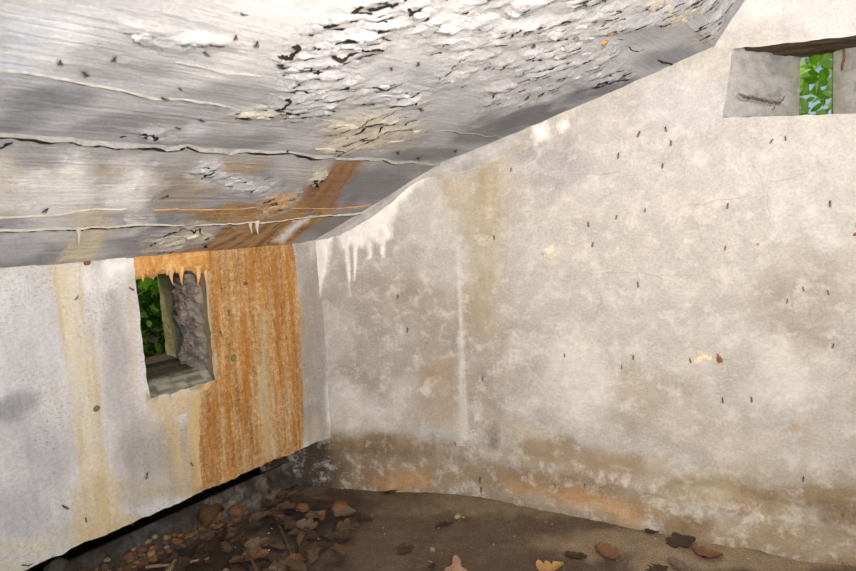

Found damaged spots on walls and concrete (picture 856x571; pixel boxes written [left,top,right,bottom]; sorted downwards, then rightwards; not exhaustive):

spalling [105,15,253,63]
crack [0,69,239,110]
spalling [110,118,187,146]
crack [0,132,440,166]
spalling [182,0,745,220]
crack [0,212,362,233]
corrosion [126,156,378,505]
water stain [316,111,715,543]
water stain [721,465,856,542]